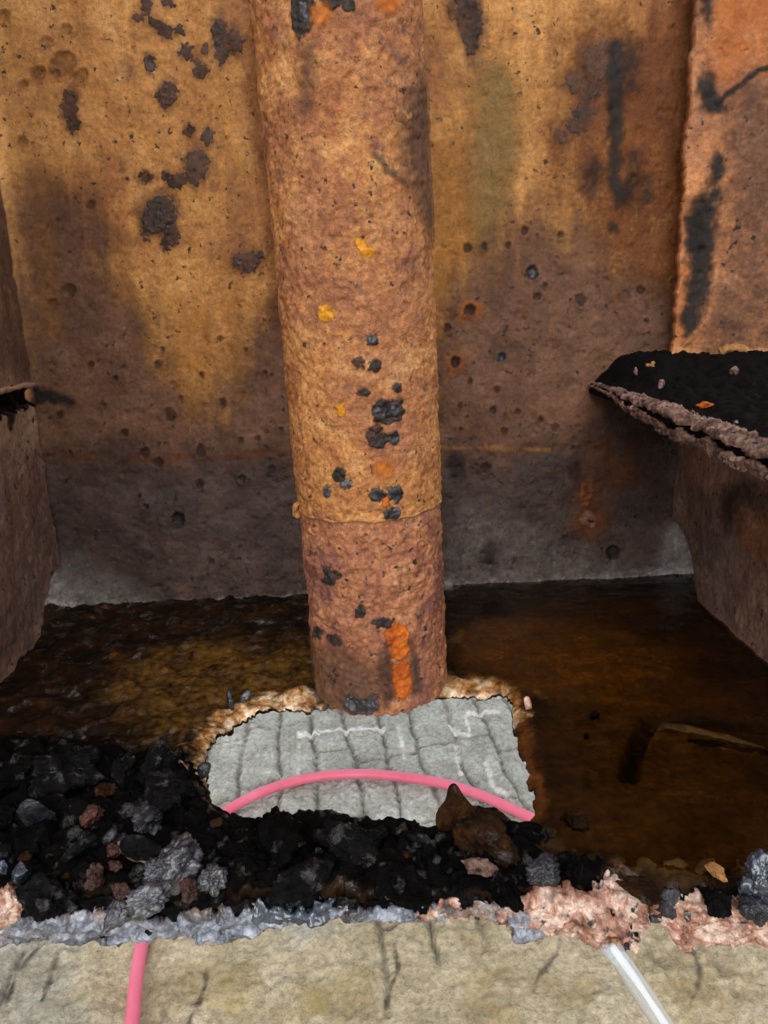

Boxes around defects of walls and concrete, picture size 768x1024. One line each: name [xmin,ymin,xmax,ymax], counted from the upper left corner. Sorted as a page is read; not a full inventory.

corrosion [290,0,355,40]
corrosion [355,237,377,258]
corrosion [318,304,336,322]
corrosion [351,333,382,373]
corrosion [358,382,406,520]
leakage [404,0,768,878]
corrosion [323,467,352,498]
corrosion [322,566,342,586]
corrosion [355,605,395,629]
corrosion [312,627,342,646]
corrosion [343,693,379,716]
crack [385,943,400,1007]